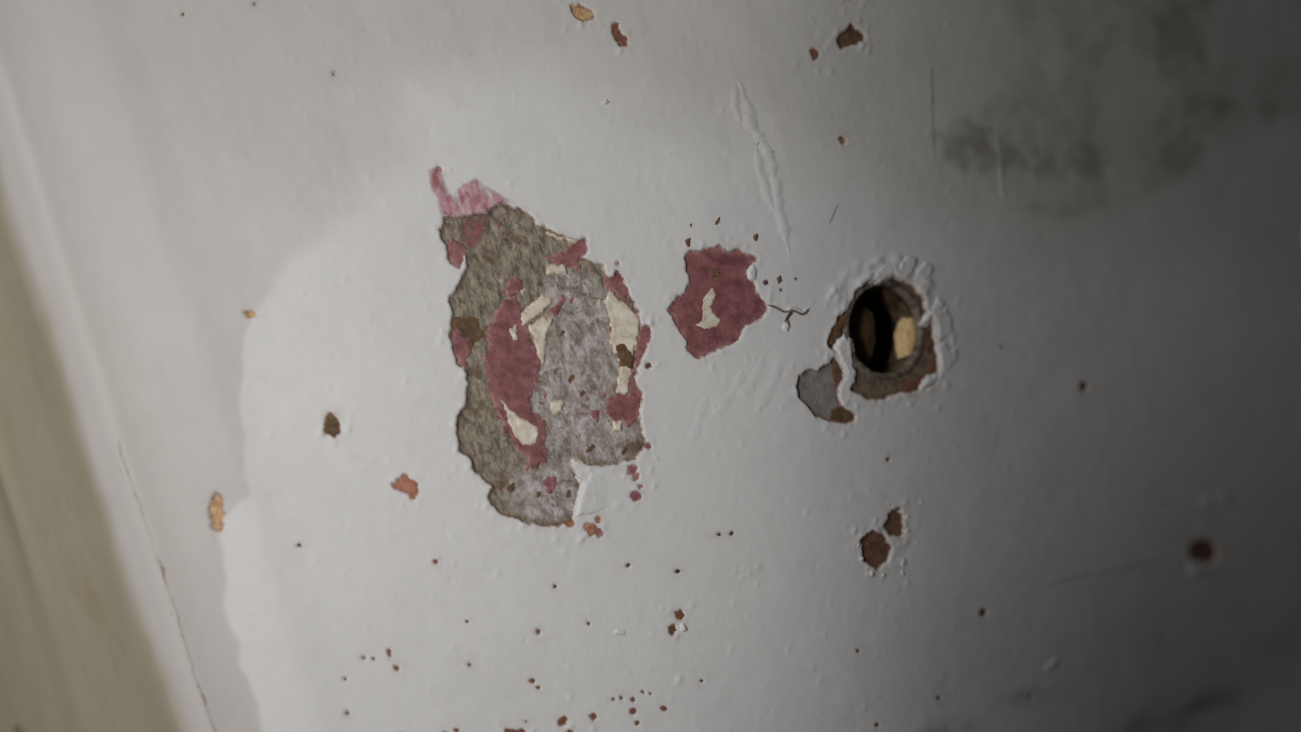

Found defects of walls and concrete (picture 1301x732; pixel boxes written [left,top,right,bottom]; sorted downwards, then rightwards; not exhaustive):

peeling [837,25,863,49]
peeling [668,223,766,358]
peeling [868,263,893,285]
peeling [919,296,946,327]
peeling [431,167,651,537]
peeling [796,312,858,423]
peeling [918,342,957,393]
peeling [860,508,902,569]
peeling [1189,538,1216,562]